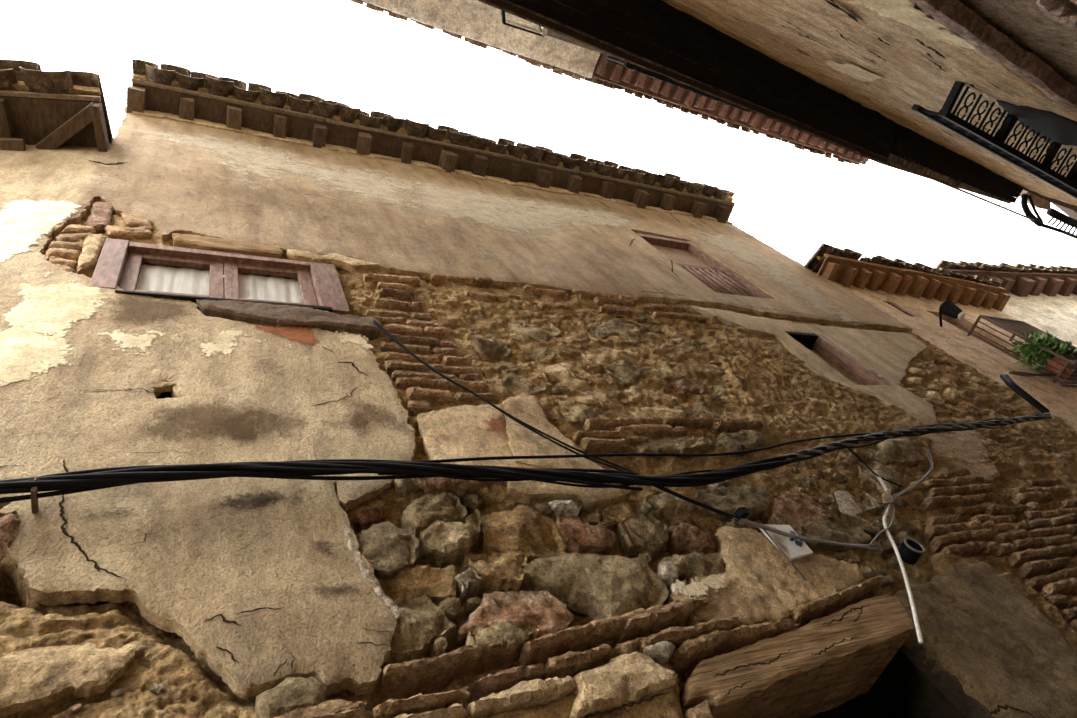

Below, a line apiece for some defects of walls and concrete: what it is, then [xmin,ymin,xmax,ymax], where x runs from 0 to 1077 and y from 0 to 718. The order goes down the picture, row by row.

peeling [0,199,193,386]
leakage [147,402,301,441]
peeling [196,327,266,359]
spalling [335,273,764,460]
spalling [901,351,1016,422]
spalling [0,511,20,561]
crack [59,459,126,579]
spalling [255,437,1077,718]
crack [204,607,284,663]
spalling [68,704,83,714]